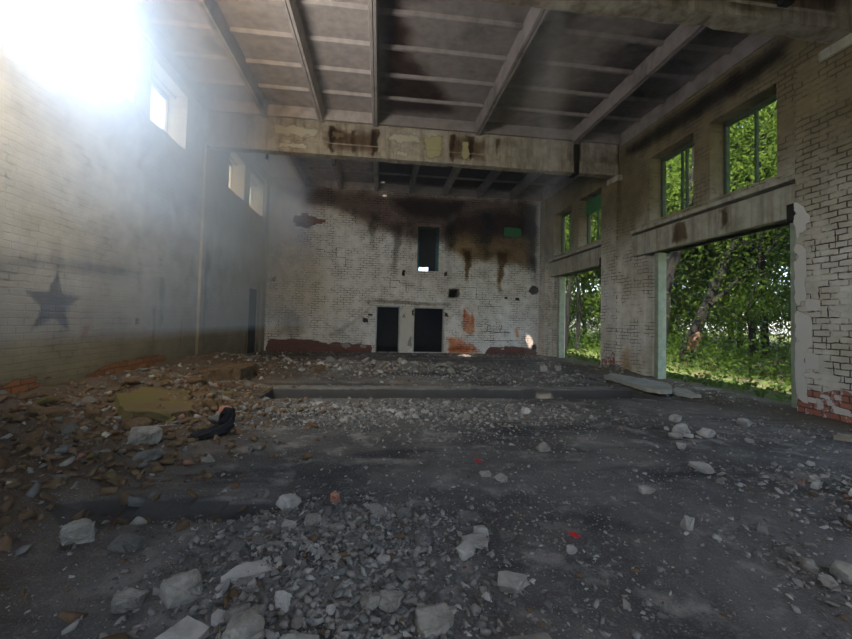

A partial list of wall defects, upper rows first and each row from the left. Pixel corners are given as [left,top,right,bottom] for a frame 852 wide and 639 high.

leakage [330,126,380,156]
leakage [449,135,483,160]
spalling [292,212,326,229]
leakage [450,214,533,283]
flaking render [793,202,852,424]
flaking render [266,338,372,352]
flaking render [485,344,537,355]